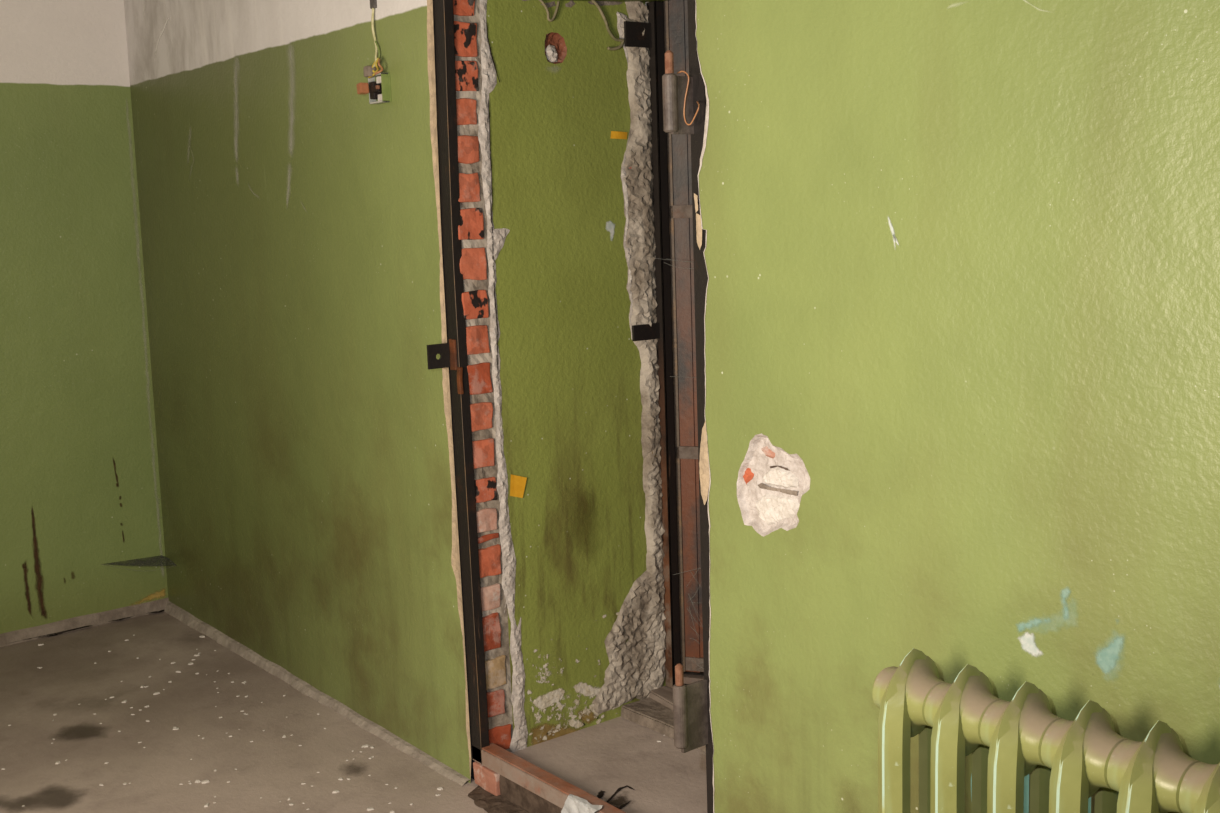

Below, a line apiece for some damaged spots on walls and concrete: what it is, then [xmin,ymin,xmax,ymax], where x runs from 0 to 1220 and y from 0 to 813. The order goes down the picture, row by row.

spalling [427,0,447,343]
spalling [694,0,709,328]
rust [23,508,46,618]
spalling [442,367,471,781]
flaking render [453,0,528,752]
spalling [522,0,666,716]
spalling [699,345,714,813]
spalling [737,433,811,537]
peeling [1018,619,1046,656]
peeling [1097,638,1122,673]